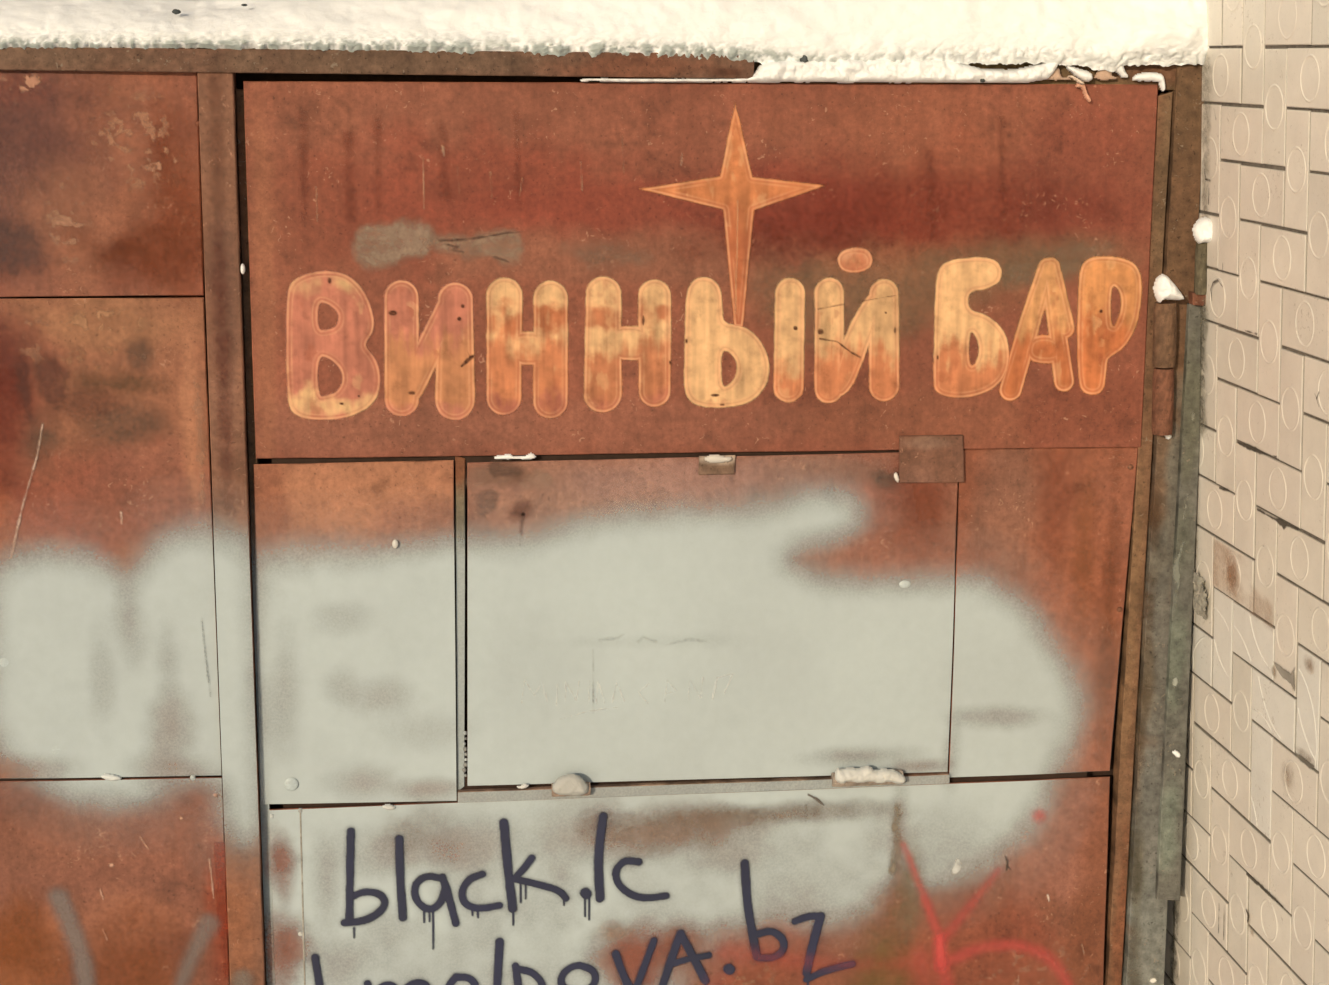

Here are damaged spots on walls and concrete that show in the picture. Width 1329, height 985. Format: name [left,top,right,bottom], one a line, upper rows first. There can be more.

peeling [20,75,41,92]
peeling [100,112,177,185]
corrosion [214,842,228,975]